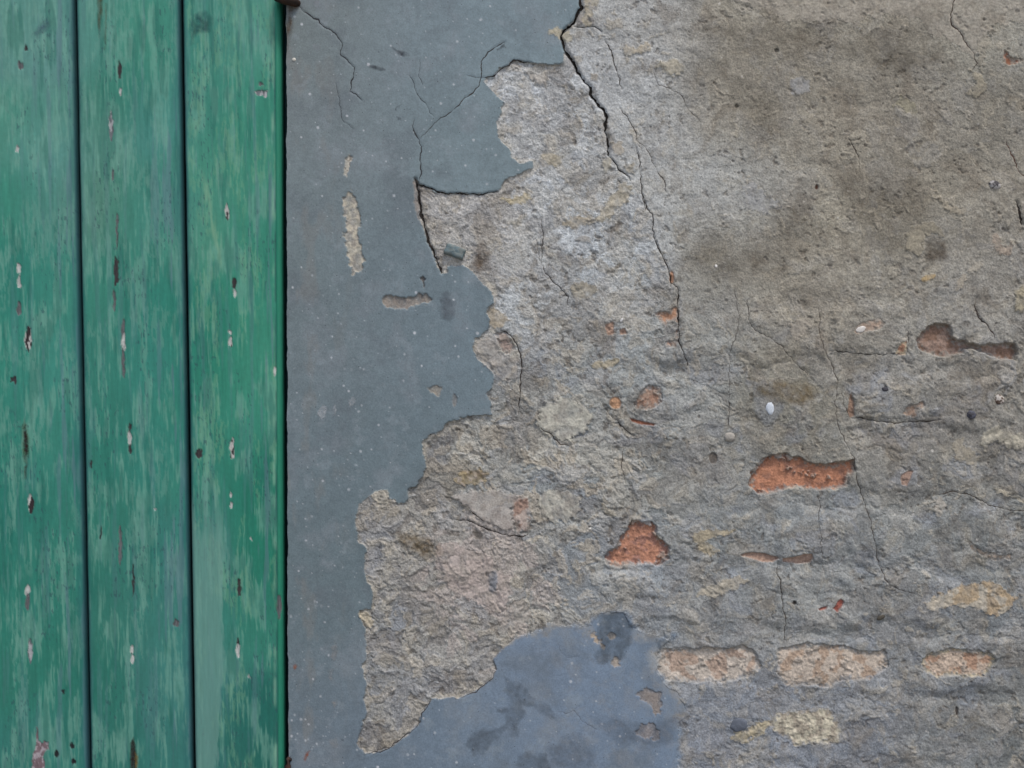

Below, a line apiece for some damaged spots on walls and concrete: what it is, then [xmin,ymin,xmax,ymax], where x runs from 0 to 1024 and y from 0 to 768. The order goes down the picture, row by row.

crack [299,6,361,127]
peeling [343,193,365,275]
crack [409,42,531,272]
crack [560,0,688,370]
flaking render [897,324,1016,359]
peeling [356,55,682,752]
flaking render [748,453,854,495]